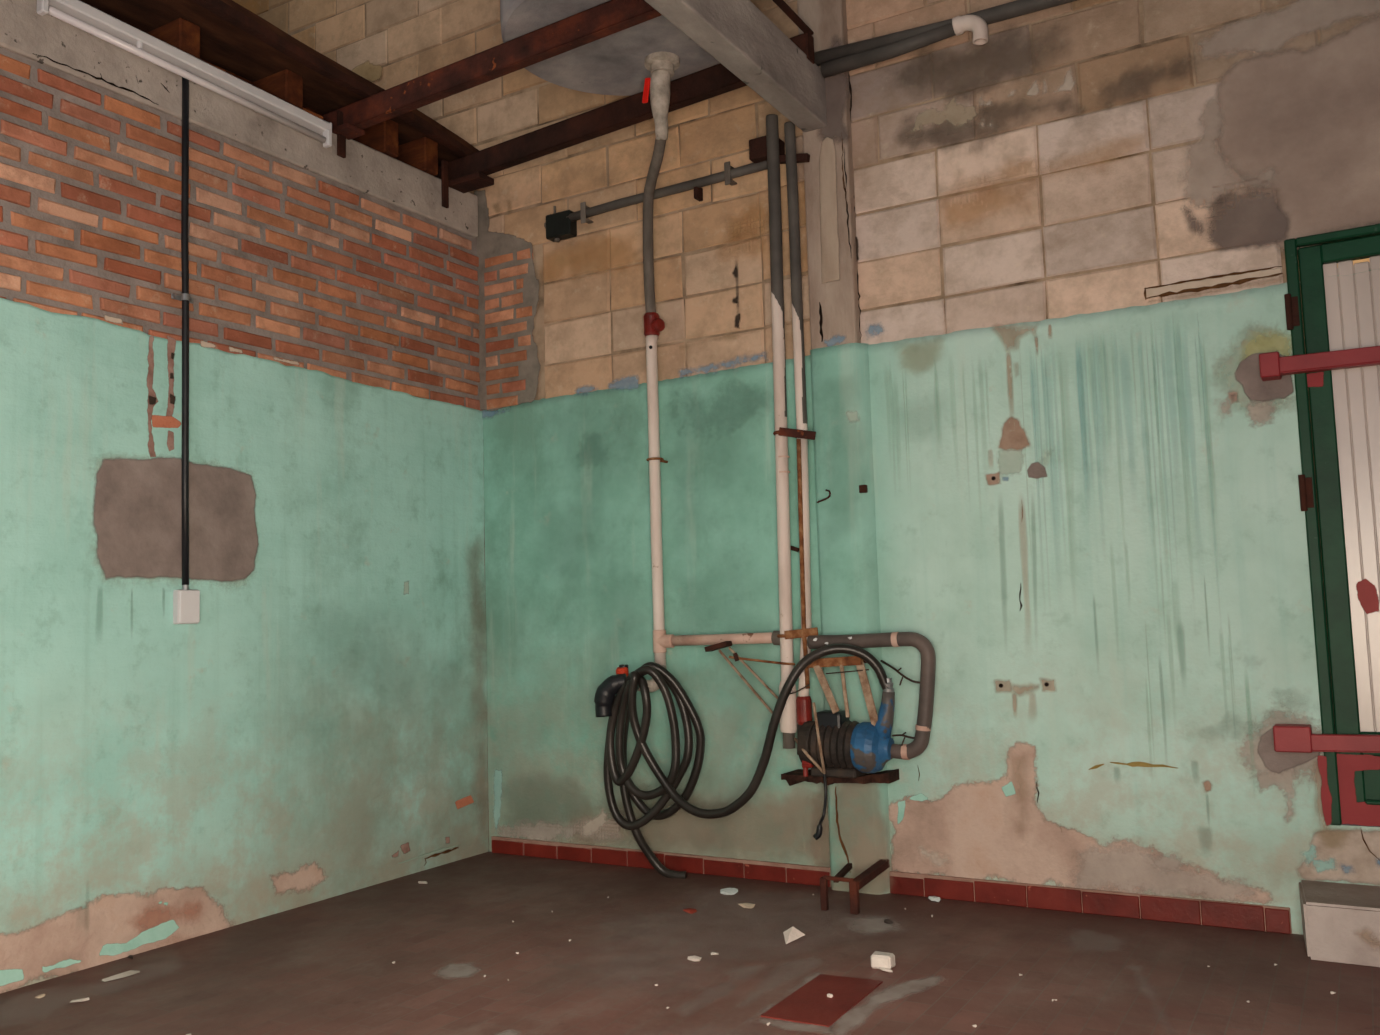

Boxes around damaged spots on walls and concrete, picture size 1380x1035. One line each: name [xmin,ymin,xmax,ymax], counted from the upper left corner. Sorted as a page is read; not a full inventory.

crack [32,53,170,105]
leakage [900,39,1073,144]
flaking render [152,415,181,428]
flaking render [272,862,325,894]
flaking render [889,743,1271,904]
peeling [1298,767,1380,885]
flaking render [0,887,234,994]